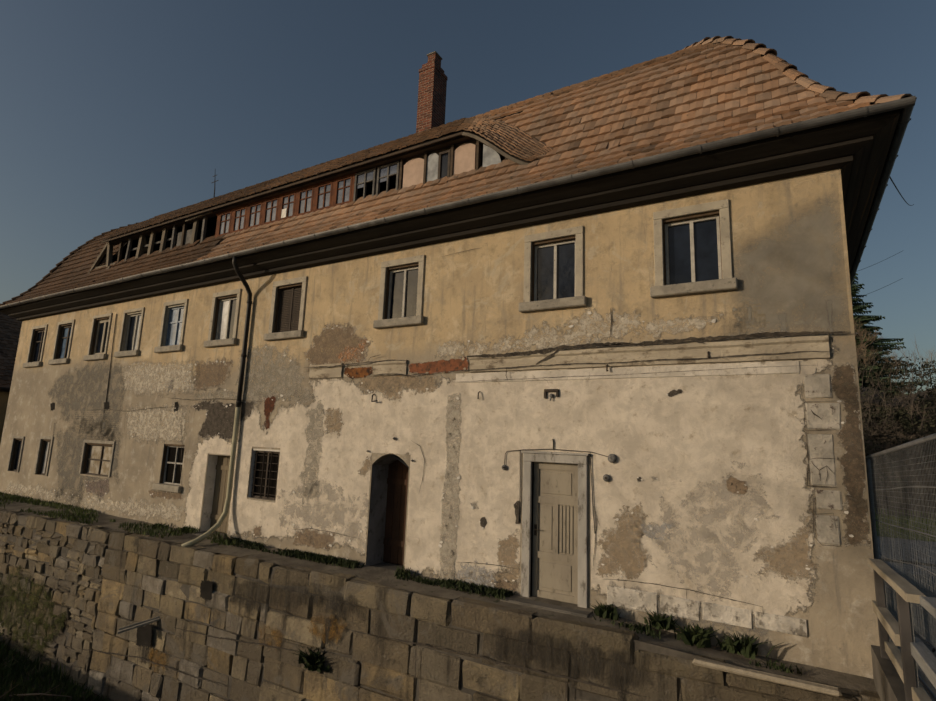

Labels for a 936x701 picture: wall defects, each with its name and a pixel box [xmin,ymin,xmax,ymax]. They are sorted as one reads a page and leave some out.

peeling [435,307,744,370]
flaking render [126,322,373,553]
corrosion [264,396,276,430]
flaking render [358,372,438,401]
flaking render [490,501,521,591]
flaking render [596,474,817,601]